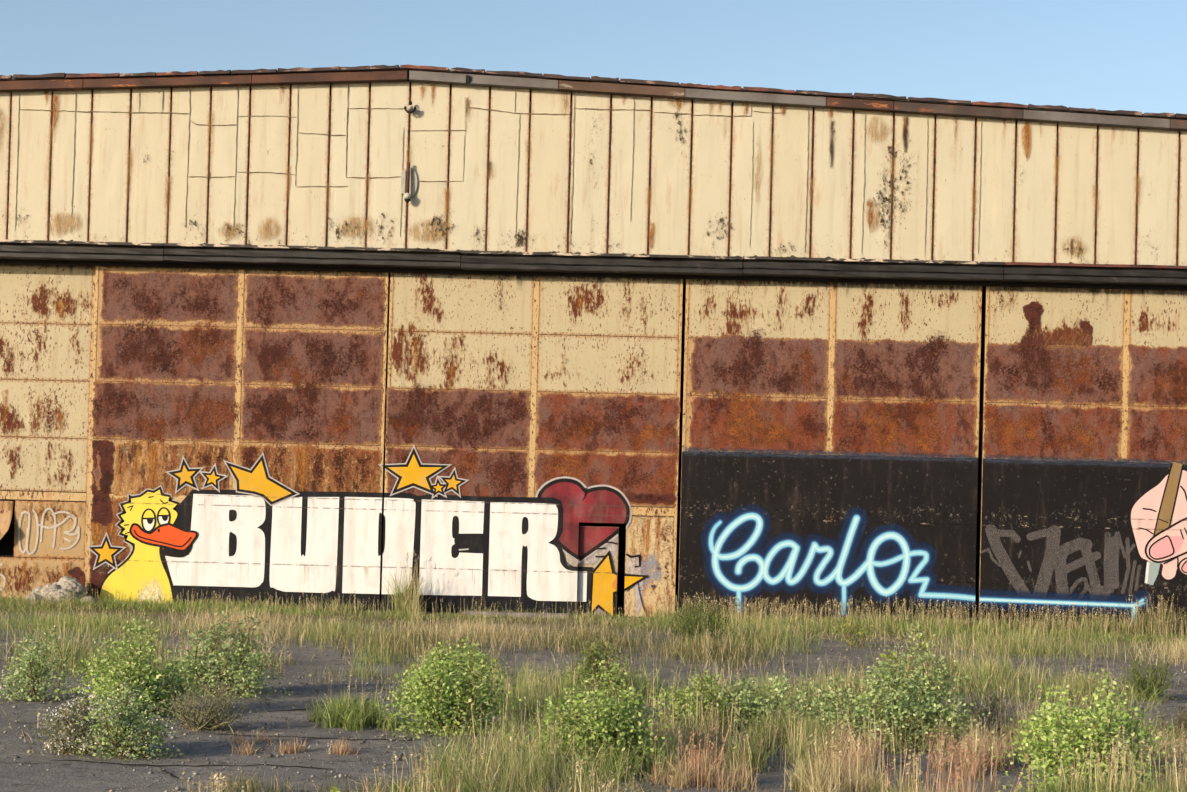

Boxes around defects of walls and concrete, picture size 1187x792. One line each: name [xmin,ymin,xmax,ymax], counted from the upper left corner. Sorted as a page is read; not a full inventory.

rust [45,92,58,127]
rust [1022,122,1031,156]
mould [873,142,919,248]
rust [0,270,1187,617]